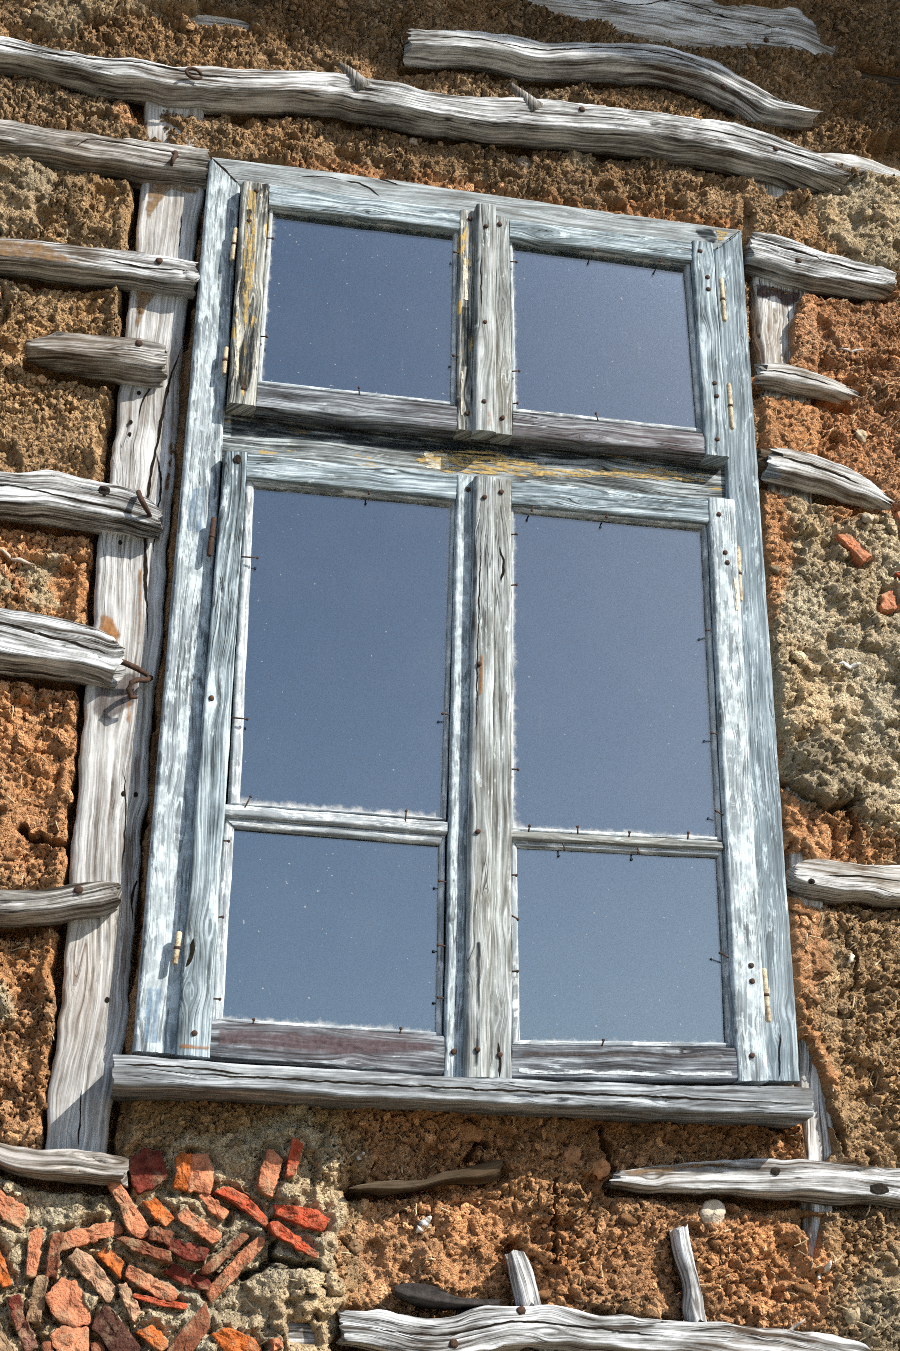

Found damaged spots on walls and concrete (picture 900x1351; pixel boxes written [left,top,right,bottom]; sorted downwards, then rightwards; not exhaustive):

peeling [231,415,718,482]
crack [547,1177,562,1264]